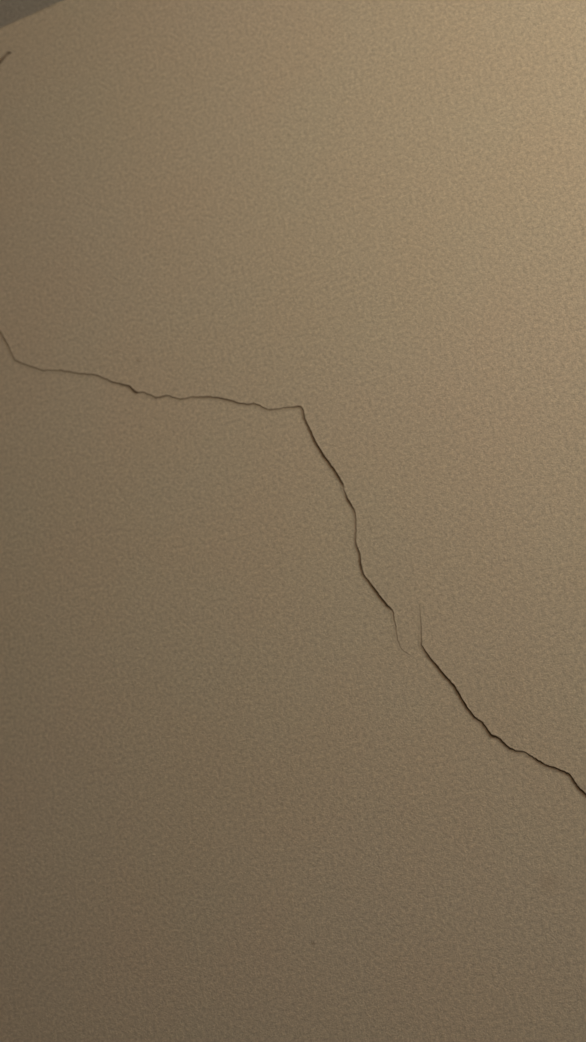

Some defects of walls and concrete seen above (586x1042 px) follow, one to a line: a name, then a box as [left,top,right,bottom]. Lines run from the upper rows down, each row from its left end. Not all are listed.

crack [0,50,12,66]
crack [0,328,586,799]